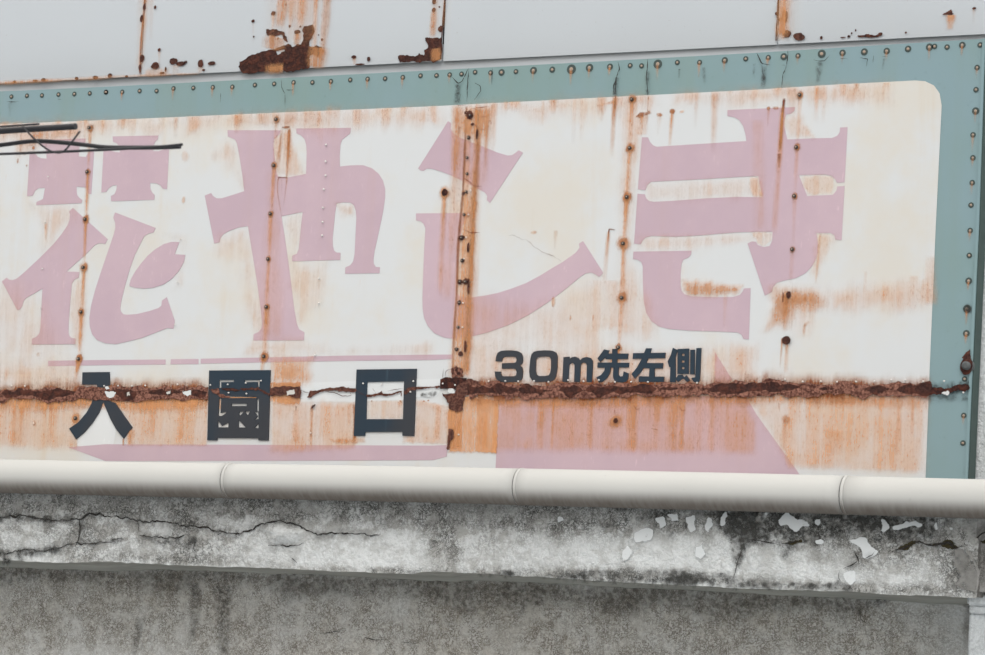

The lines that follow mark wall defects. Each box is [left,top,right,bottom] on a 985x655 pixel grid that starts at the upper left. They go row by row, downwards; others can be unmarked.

corrosion [125,0,186,77]
corrosion [239,0,329,74]
corrosion [398,0,445,63]
corrosion [0,354,208,445]
damp [0,547,114,581]
crack [0,512,377,563]
peeling [622,511,729,561]
peeling [779,513,821,532]
damp [698,511,935,564]
peeling [841,537,878,559]
peeling [881,519,922,532]
damp [362,570,886,612]